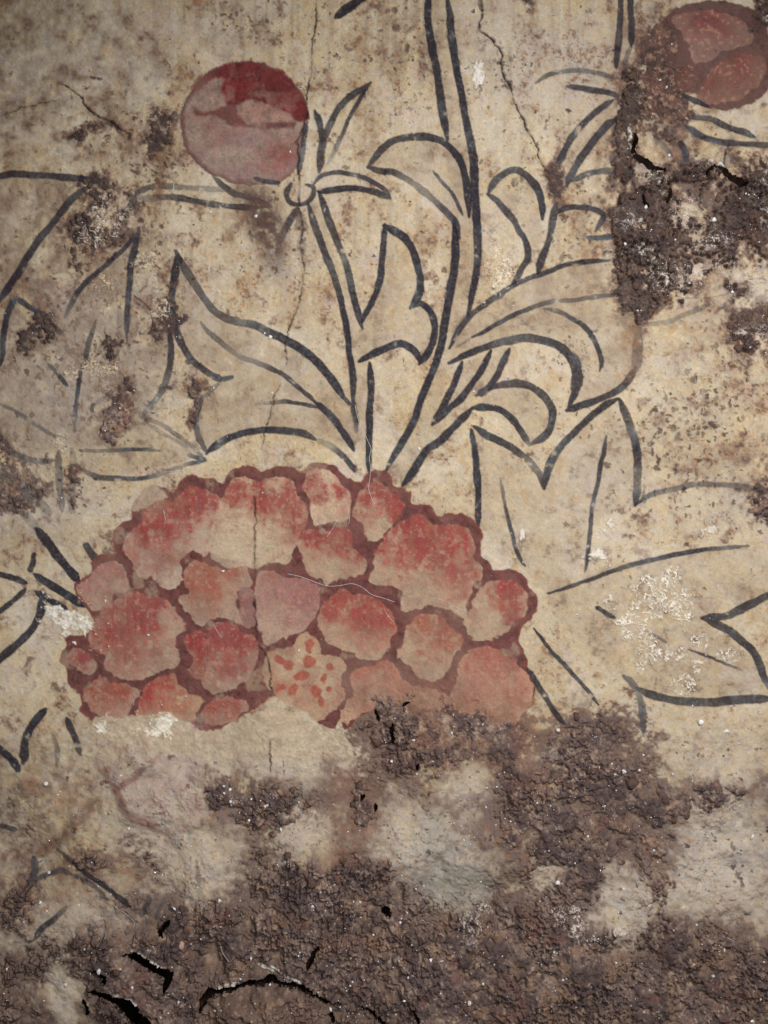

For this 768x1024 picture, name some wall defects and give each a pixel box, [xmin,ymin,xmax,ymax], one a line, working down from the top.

crack [475,0,623,229]
crack [631,132,673,208]
crack [259,0,319,450]
leakage [605,149,768,387]
leakage [601,556,744,696]
leakage [345,661,535,769]
leakage [46,838,147,915]
crack [82,971,151,1024]
crack [122,920,174,994]
crack [198,946,386,1024]
leakage [395,804,504,952]
leakage [542,899,629,948]